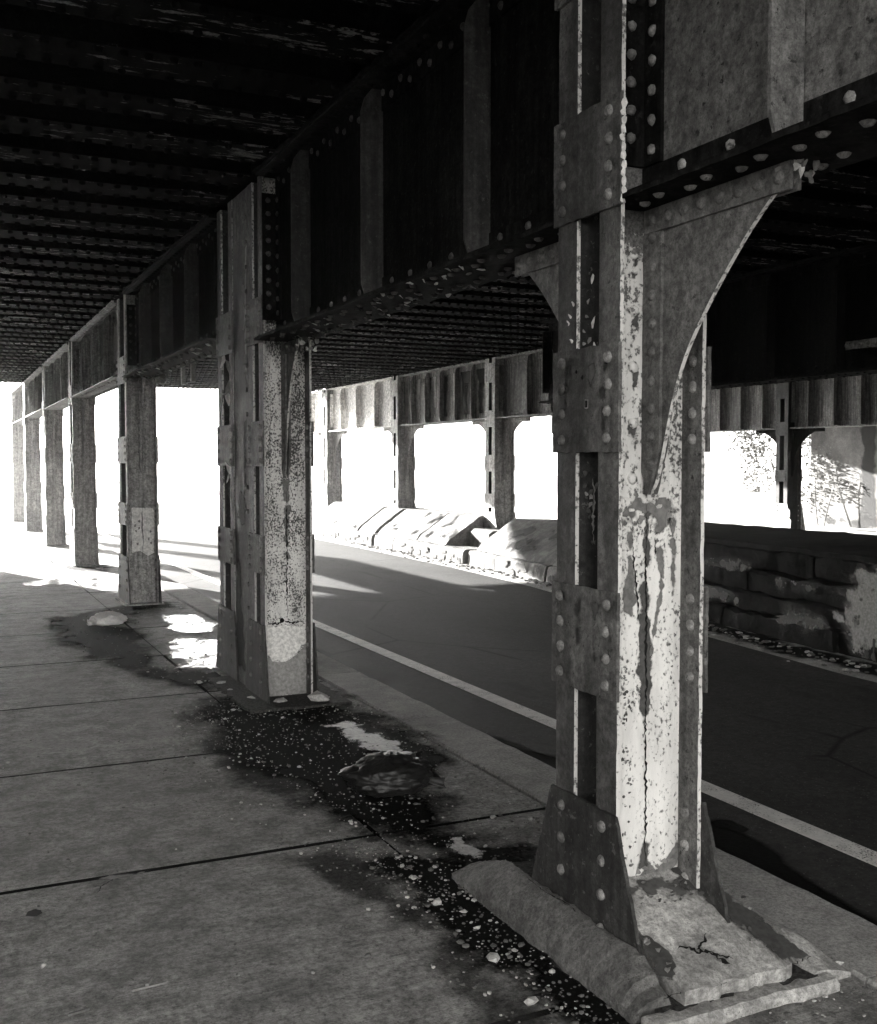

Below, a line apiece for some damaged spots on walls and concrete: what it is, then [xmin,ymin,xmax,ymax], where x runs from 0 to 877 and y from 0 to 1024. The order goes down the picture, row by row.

peeling [622,497,676,620]
spalling [774,568,877,662]
damp [46,601,639,1024]
damp [710,820,877,926]
crack [678,933,733,985]